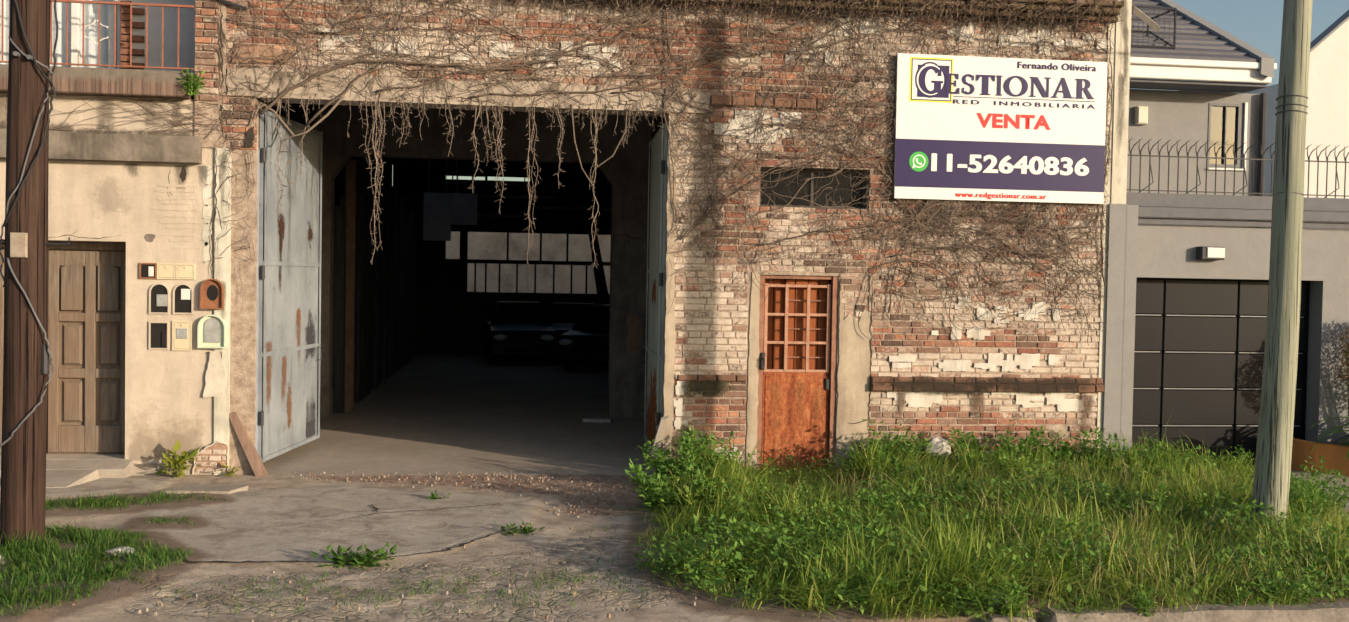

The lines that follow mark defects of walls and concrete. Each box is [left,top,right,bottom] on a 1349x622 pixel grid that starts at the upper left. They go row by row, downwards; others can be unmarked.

peeling [714,110,801,143]
rust [297,309,316,359]
peeling [931,296,1060,372]
peeling [889,355,916,369]
rust [267,343,316,438]
peeling [673,374,688,429]
peeling [887,391,943,408]
peeling [971,392,1096,412]